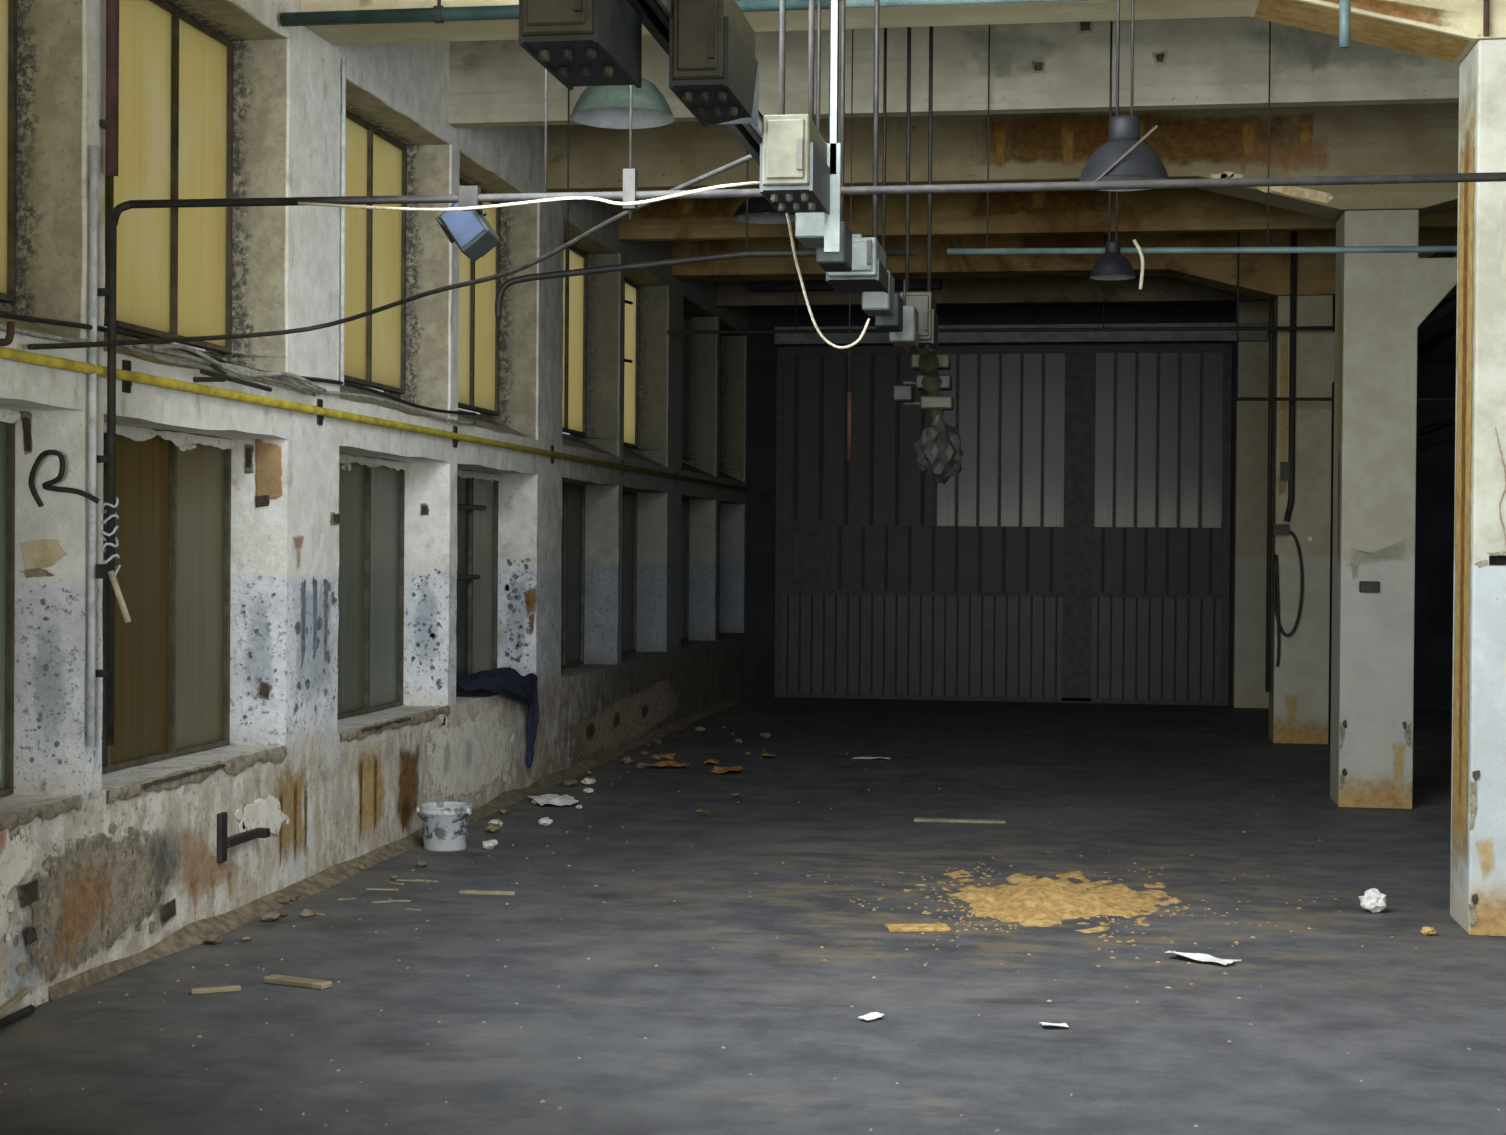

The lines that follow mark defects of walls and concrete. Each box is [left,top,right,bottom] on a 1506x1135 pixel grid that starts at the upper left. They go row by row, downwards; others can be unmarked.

crack [1495,428,1506,545]
peeling [234,795,290,836]
rust [1339,782,1412,809]
flaking render [0,822,176,994]
rust [1470,900,1506,936]